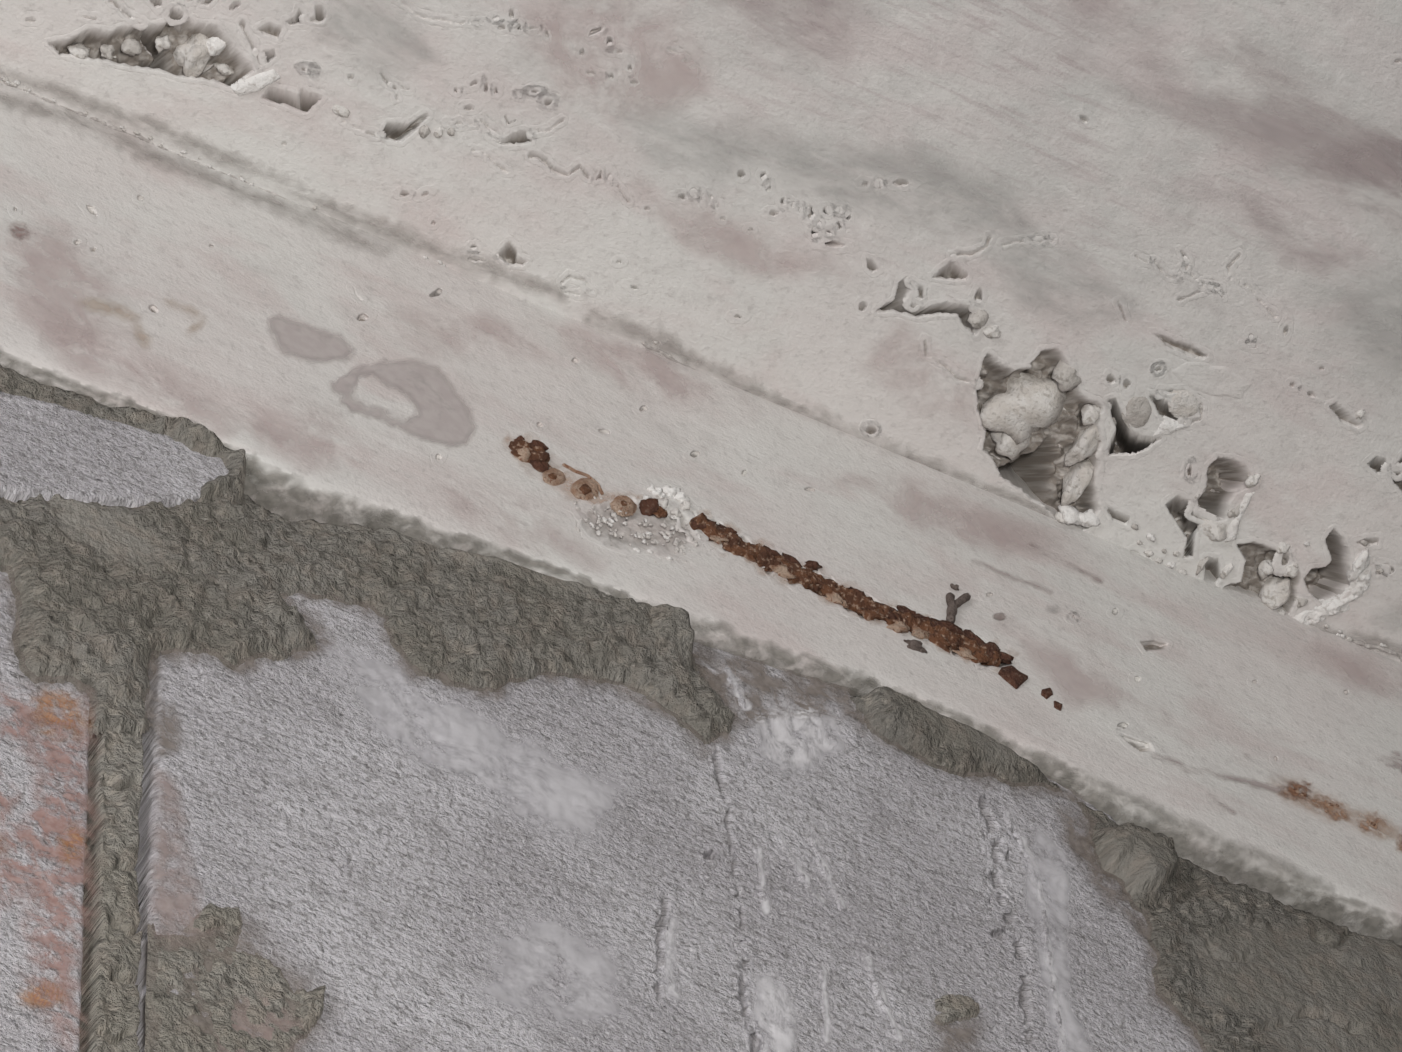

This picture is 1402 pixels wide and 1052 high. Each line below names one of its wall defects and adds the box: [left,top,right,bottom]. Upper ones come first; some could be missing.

spalling [145,0,332,120]
spalling [927,254,988,313]
damp [270,317,474,445]
spalling [1101,327,1253,436]
corrosion [508,435,637,517]
spalling [1098,498,1136,531]
spalling [1161,455,1255,588]
spalling [1271,541,1297,577]
peeling [1288,557,1402,625]
spalling [1362,449,1402,482]
corrosion [1284,782,1402,850]
spalling [649,887,678,1009]